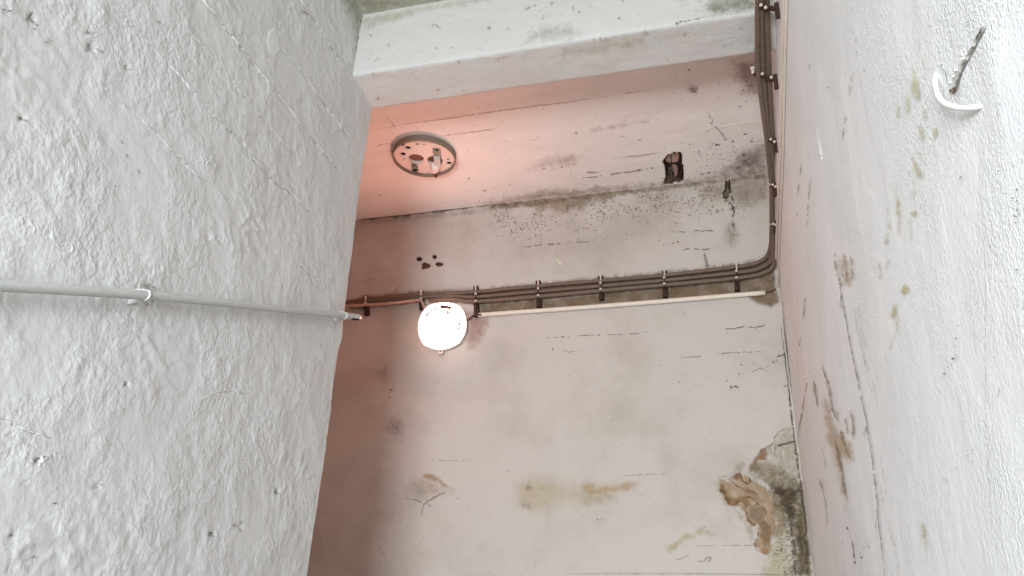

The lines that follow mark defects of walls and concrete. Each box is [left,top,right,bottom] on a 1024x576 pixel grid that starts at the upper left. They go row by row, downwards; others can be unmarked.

peeling [419,139,767,273]
damp [755,464,810,576]